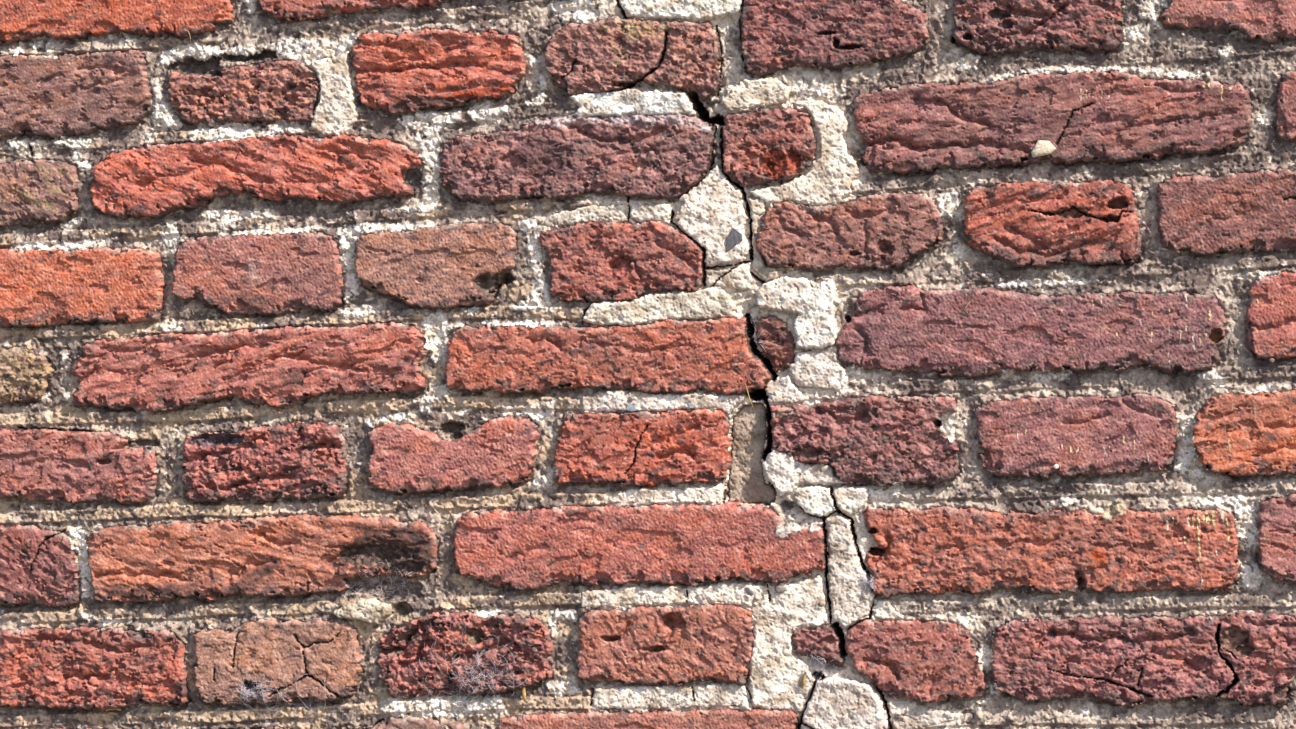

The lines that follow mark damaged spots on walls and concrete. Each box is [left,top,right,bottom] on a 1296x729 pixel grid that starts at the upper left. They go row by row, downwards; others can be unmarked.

crack [616,0,627,19]
crack [620,31,669,91]
crack [670,0,765,287]
crack [624,425,648,474]
crack [744,313,878,729]
crack [213,633,239,681]
crack [271,632,342,697]
crack [876,686,892,729]
crack [1048,660,1153,698]
crack [1214,624,1240,698]